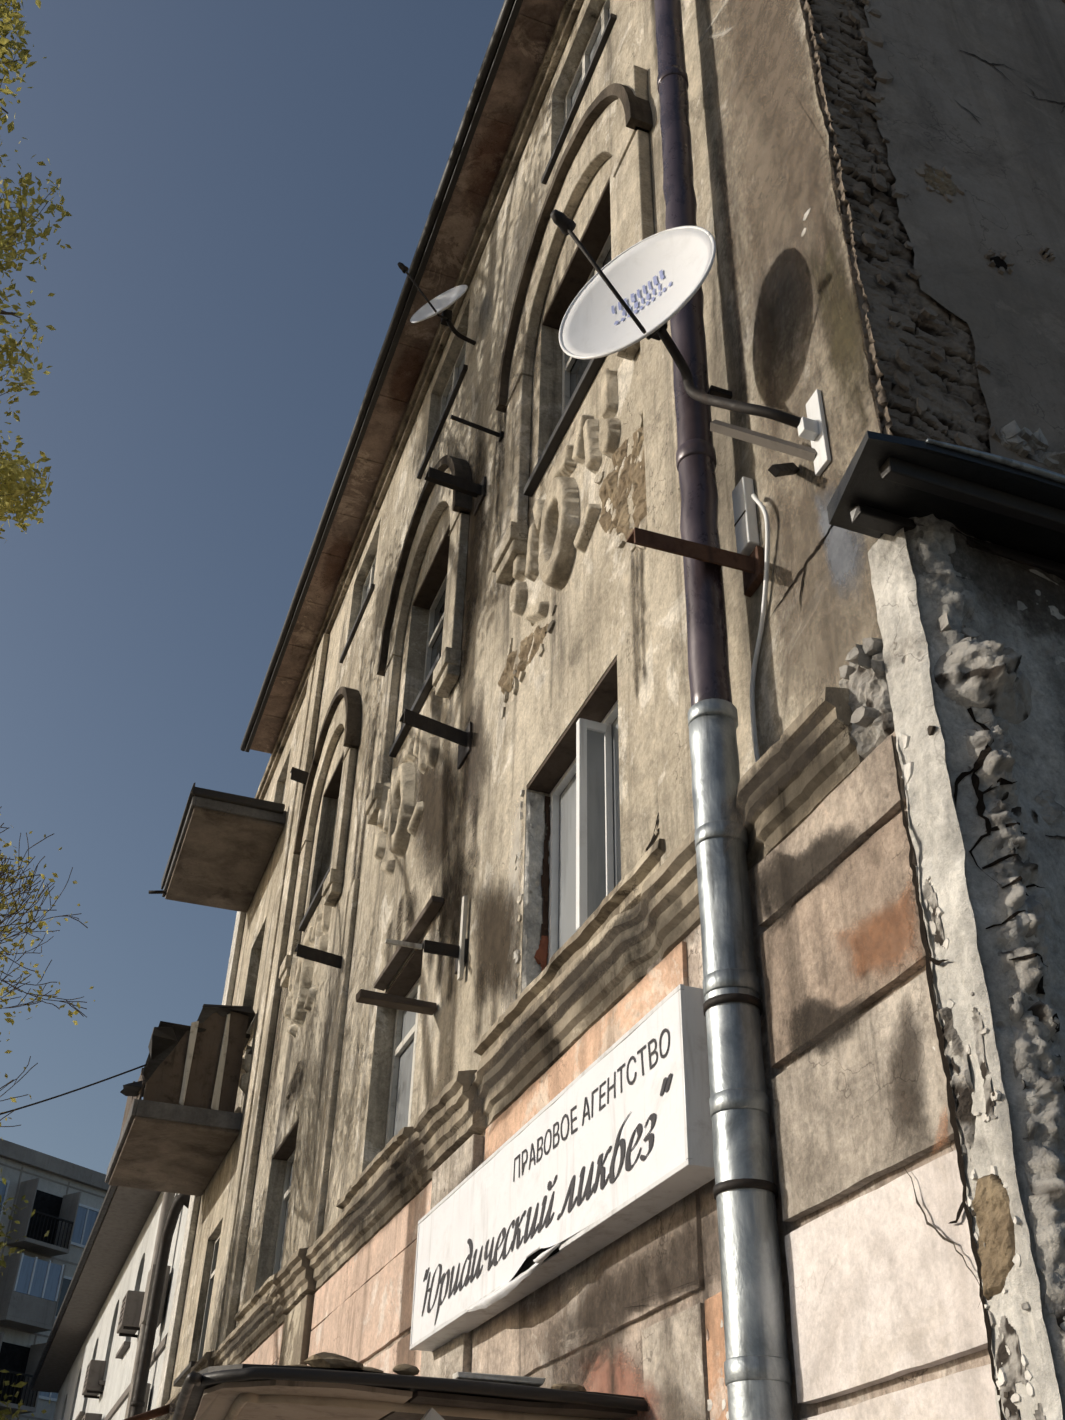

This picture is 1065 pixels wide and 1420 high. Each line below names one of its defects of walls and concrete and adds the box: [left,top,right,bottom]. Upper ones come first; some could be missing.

spalling [799,0,1065,475]
spalling [594,410,648,552]
leakage [377,83,653,1034]
crack [767,525,833,622]
spalling [498,604,557,720]
peeling [923,876,949,949]
leakage [887,1010,920,1136]
crack [891,734,1004,1420]
spalling [936,992,1045,1420]